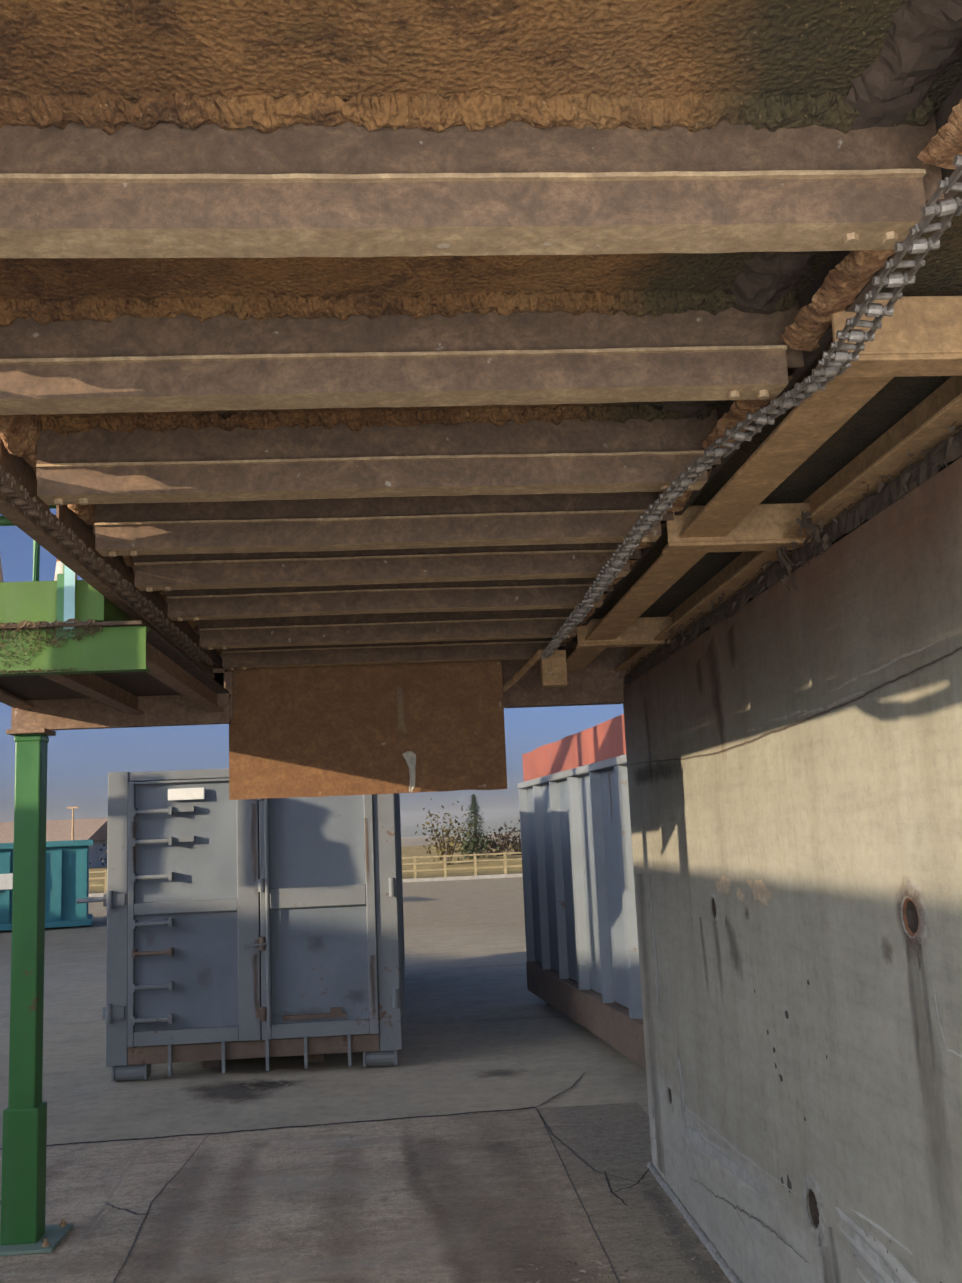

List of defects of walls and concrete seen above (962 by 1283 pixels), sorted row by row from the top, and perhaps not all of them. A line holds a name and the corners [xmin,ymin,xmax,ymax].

crack [917,950,962,1058]
crack [605,1168,649,1206]
crack [690,1177,808,1262]